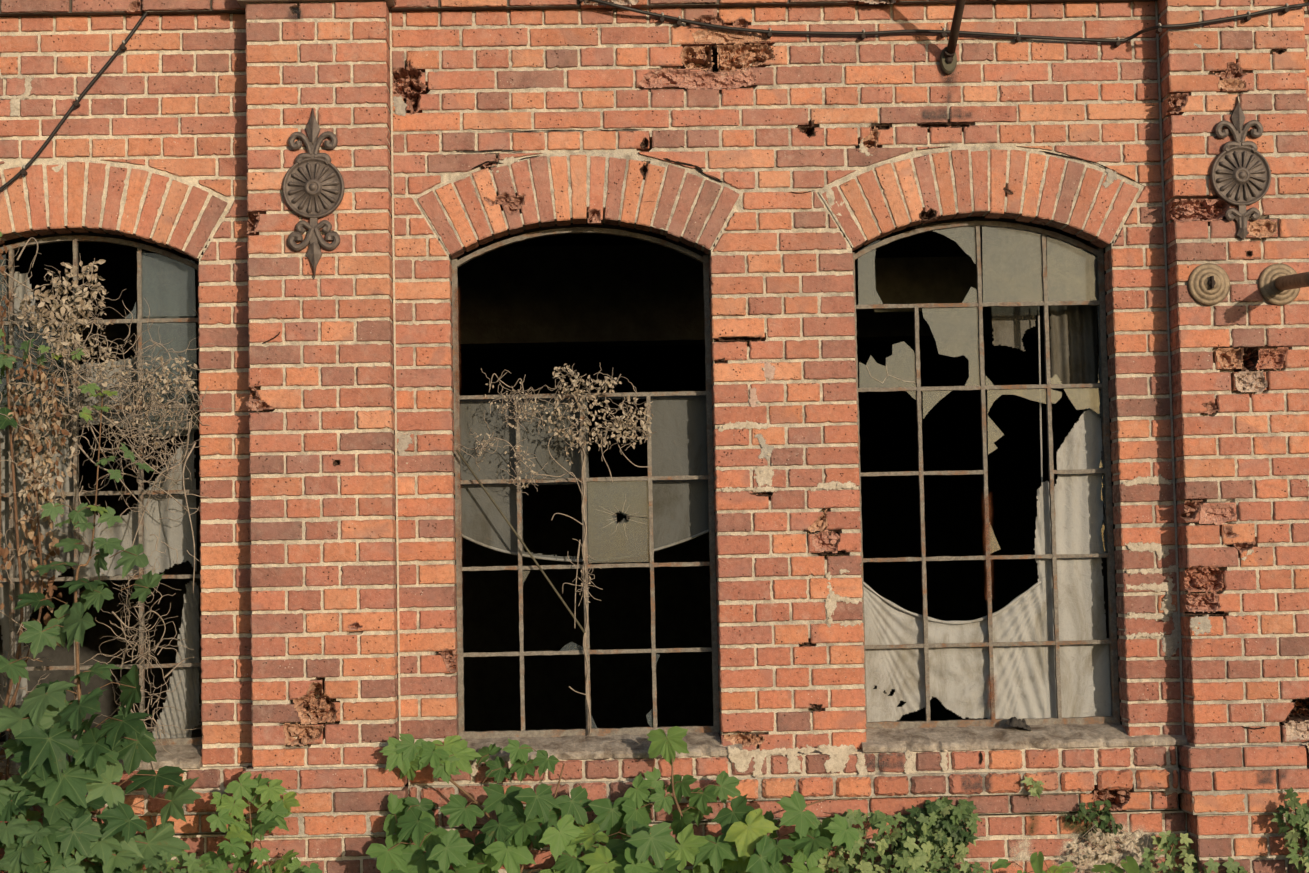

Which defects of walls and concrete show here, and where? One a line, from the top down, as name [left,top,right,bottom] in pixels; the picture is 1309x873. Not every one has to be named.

spalling [639,15,774,90]
spalling [392,61,427,115]
spalling [1168,198,1231,222]
spalling [1213,347,1289,393]
spalling [808,509,840,553]
spalling [1181,500,1256,554]
spalling [283,682,337,746]
spalling [1283,697,1309,748]